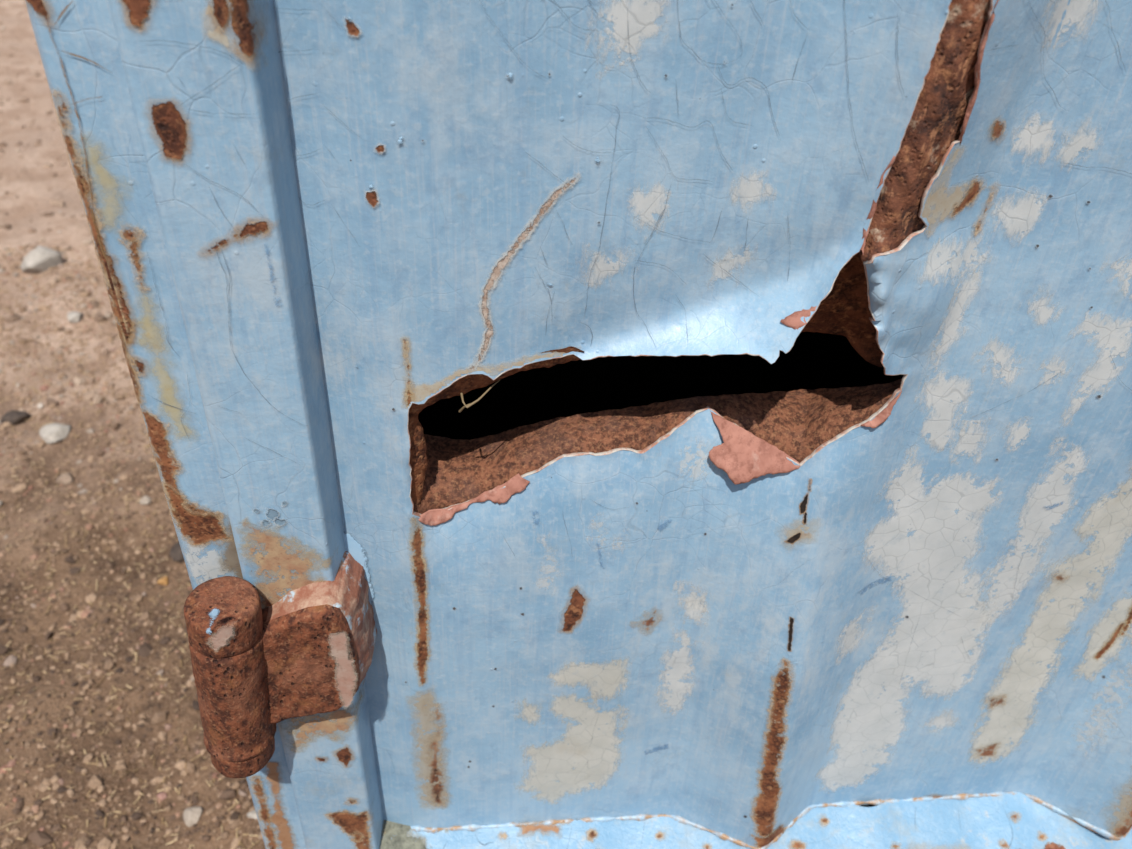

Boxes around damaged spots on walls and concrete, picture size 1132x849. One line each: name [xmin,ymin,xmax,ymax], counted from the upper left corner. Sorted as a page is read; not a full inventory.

rust [121,0,150,27]
rust [205,0,264,61]
peeling [600,0,665,65]
rust [801,0,994,367]
peeling [959,0,999,145]
peeling [993,194,1045,238]
peeling [1012,115,1096,164]
rust [52,90,331,609]
rust [403,339,902,806]
peeling [817,239,1132,791]
peeling [519,659,627,804]
rust [751,659,805,849]